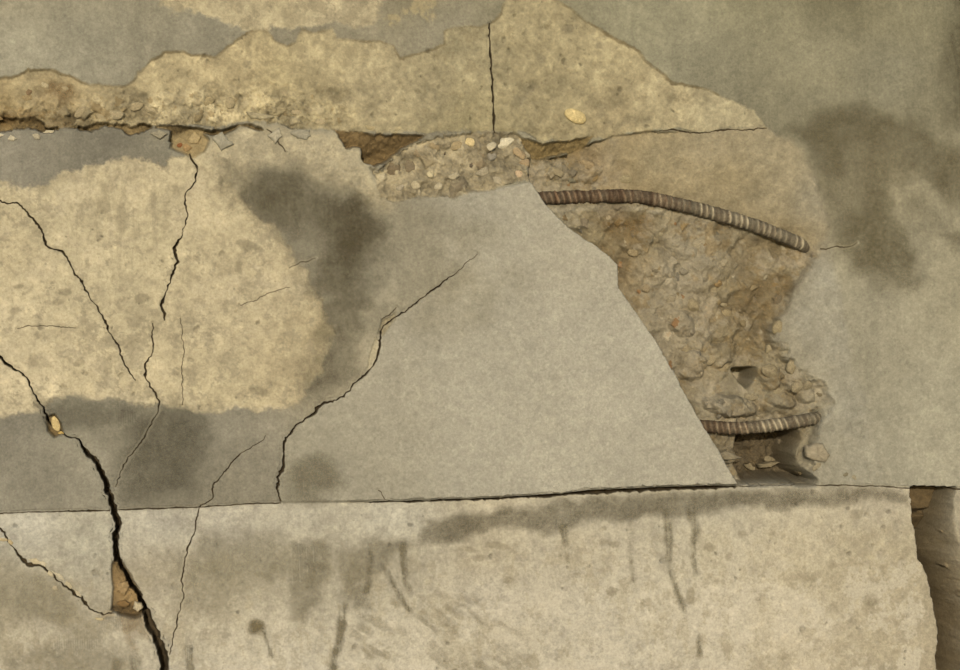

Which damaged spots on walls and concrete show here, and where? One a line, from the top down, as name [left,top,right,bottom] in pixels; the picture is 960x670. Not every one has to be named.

spalling [0,0,890,485]
damp [844,190,910,273]
crack [0,153,479,670]
damp [427,491,827,545]
damp [391,544,409,610]
crack [350,477,960,670]
damp [250,621,265,634]
damp [330,613,346,670]